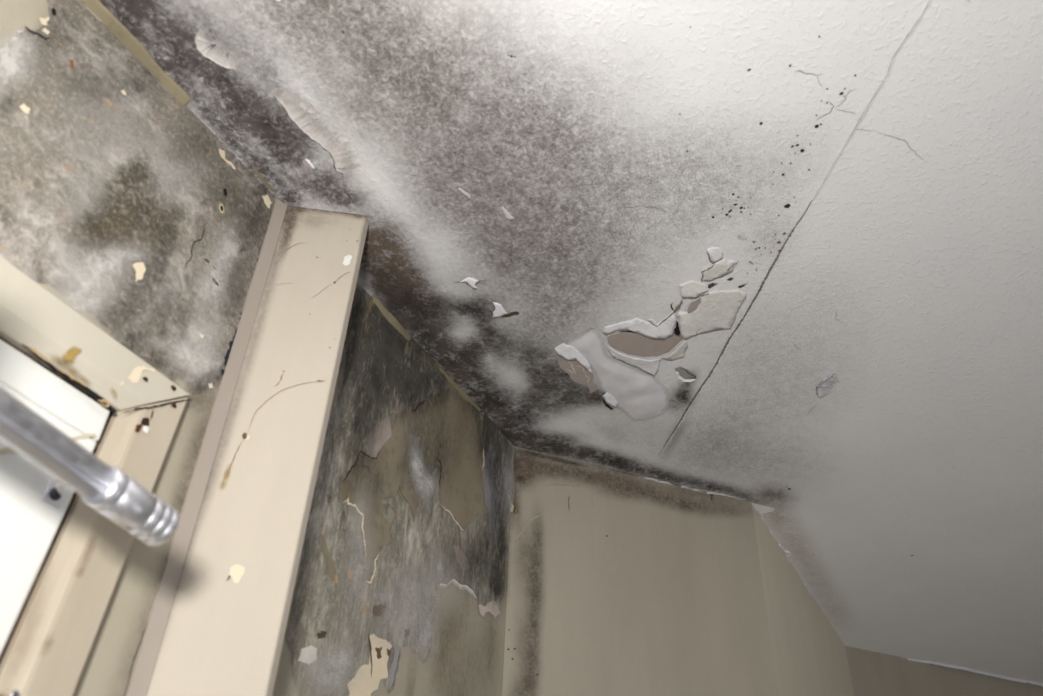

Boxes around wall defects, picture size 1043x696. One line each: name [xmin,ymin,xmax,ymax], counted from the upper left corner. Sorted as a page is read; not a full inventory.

damp [80,163,171,292]
peeling [0,0,275,393]
damp [99,0,361,253]
peeling [274,91,352,179]
peeling [284,288,516,696]
damp [271,0,600,293]
damp [341,226,749,602]
peeling [566,246,753,420]
crack [801,71,927,162]